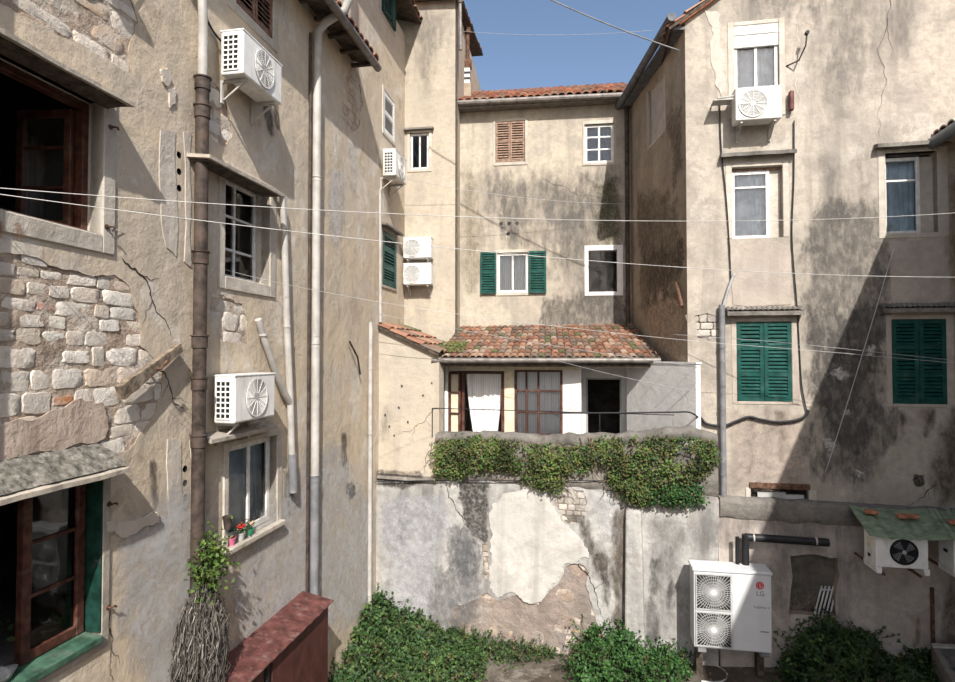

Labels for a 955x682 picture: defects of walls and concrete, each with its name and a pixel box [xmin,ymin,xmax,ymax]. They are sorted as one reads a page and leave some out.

flaking render [0,0,137,73]
flaking render [209,82,231,146]
leakage [595,183,619,243]
flaking render [0,253,162,461]
crack [122,258,171,335]
crack [159,370,187,413]
leakage [541,294,626,326]
leakage [806,201,894,480]
peeling [106,439,191,538]
leakage [459,481,488,541]
flaking render [488,486,589,604]